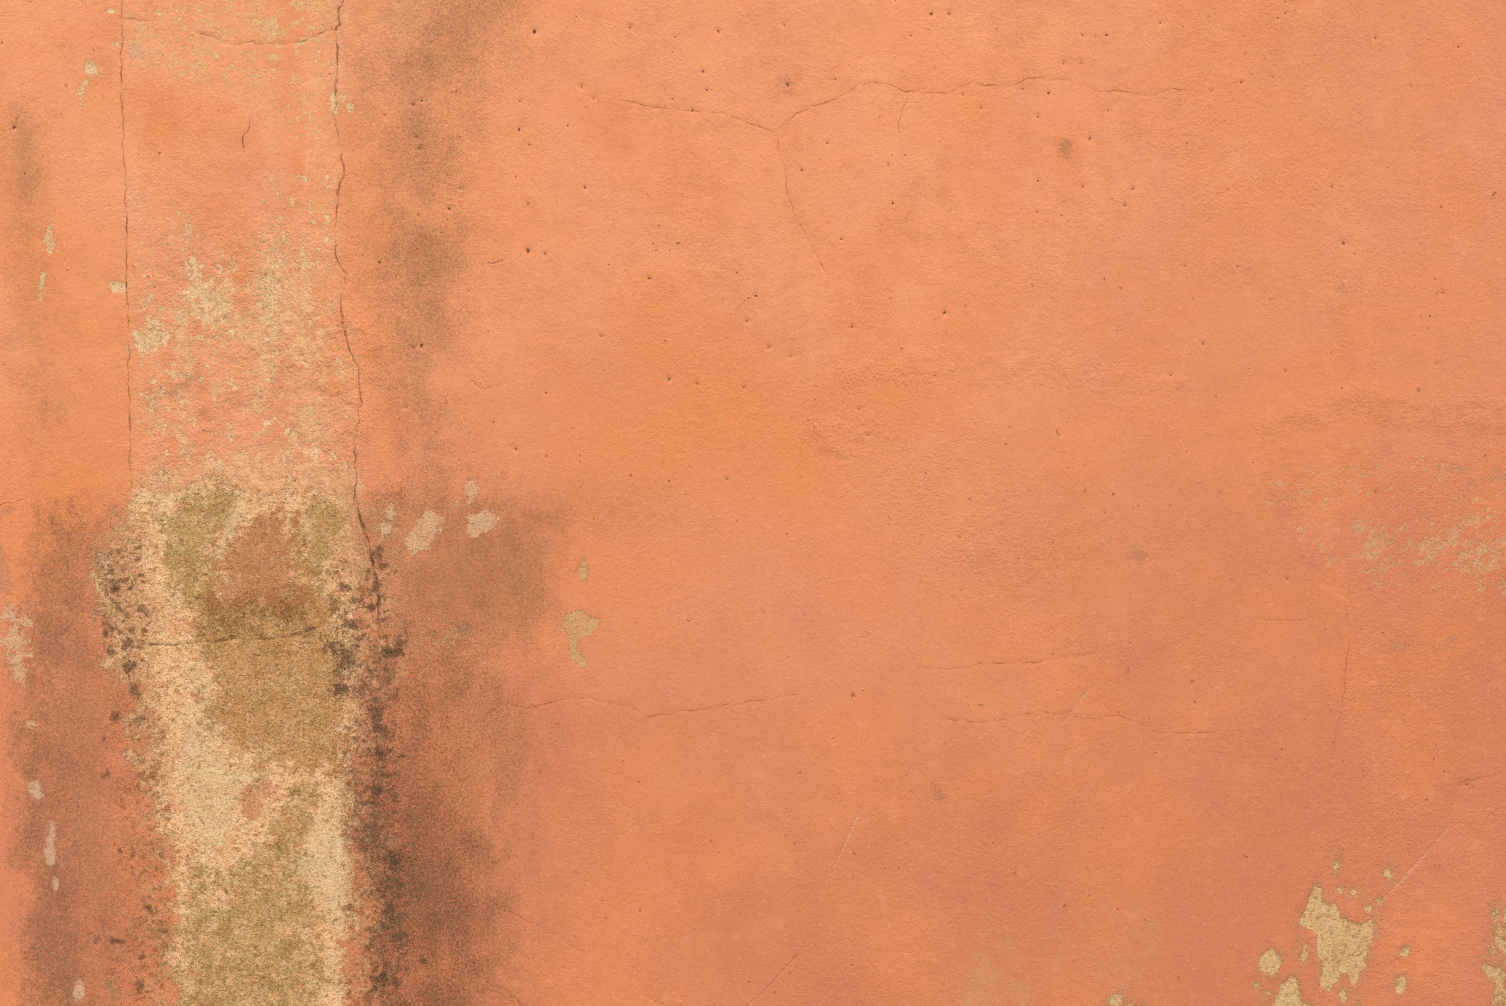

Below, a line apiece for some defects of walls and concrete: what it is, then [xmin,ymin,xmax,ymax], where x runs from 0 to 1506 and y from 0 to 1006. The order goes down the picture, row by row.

peeling [381,476,499,555]
peeling [88,173,380,1006]
peeling [558,609,601,667]
leakage [84,474,478,1006]
peeling [1253,860,1384,1006]
peeling [1480,902,1506,1006]